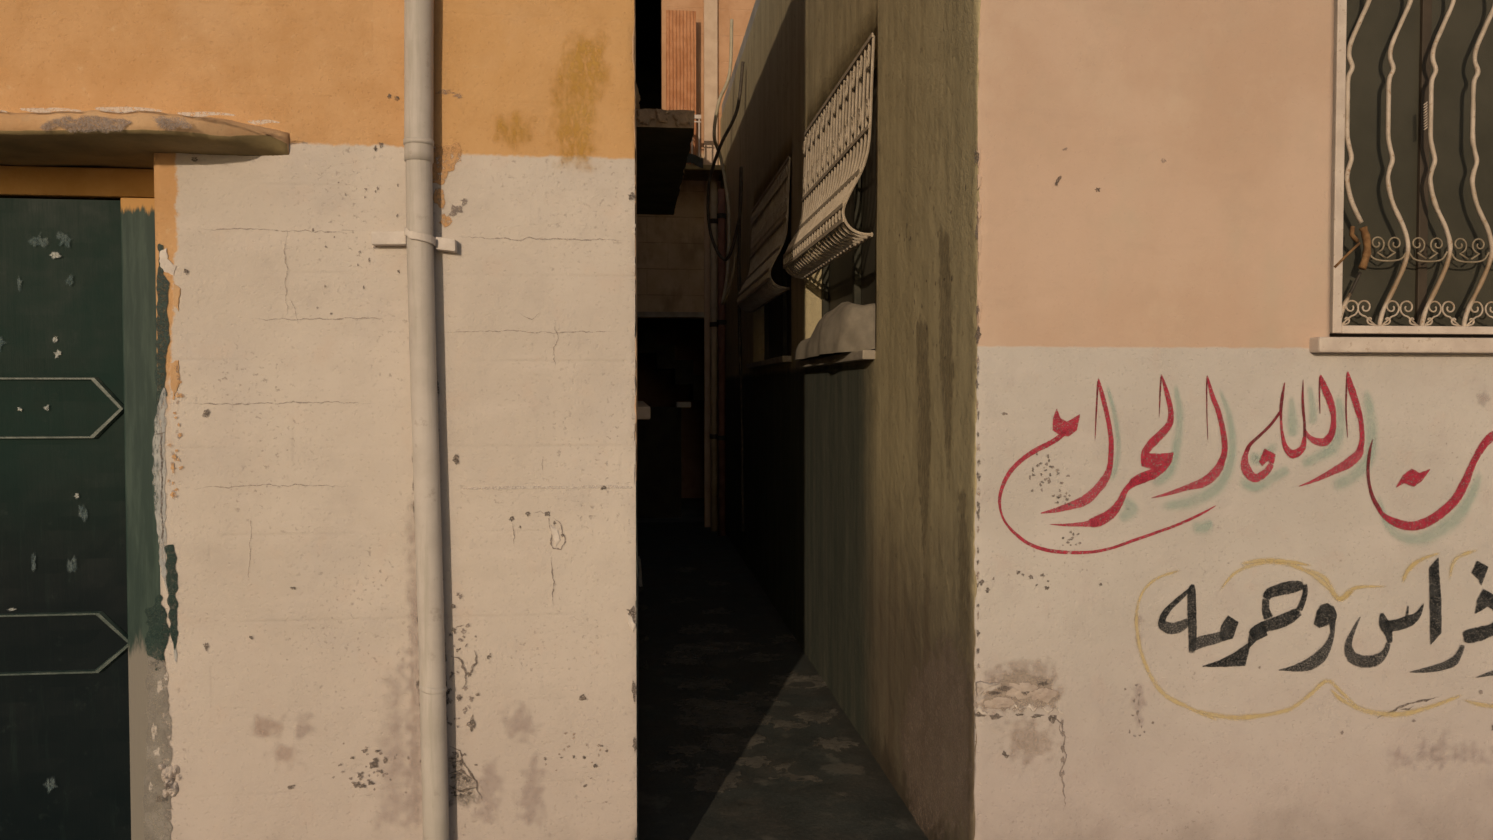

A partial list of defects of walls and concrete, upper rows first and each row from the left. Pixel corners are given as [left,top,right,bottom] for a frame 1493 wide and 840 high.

peeling [432,143,467,227]
peeling [159,248,189,311]
spalling [965,143,1065,722]
peeling [447,623,491,731]
peeling [332,743,421,791]
peeling [450,748,481,804]